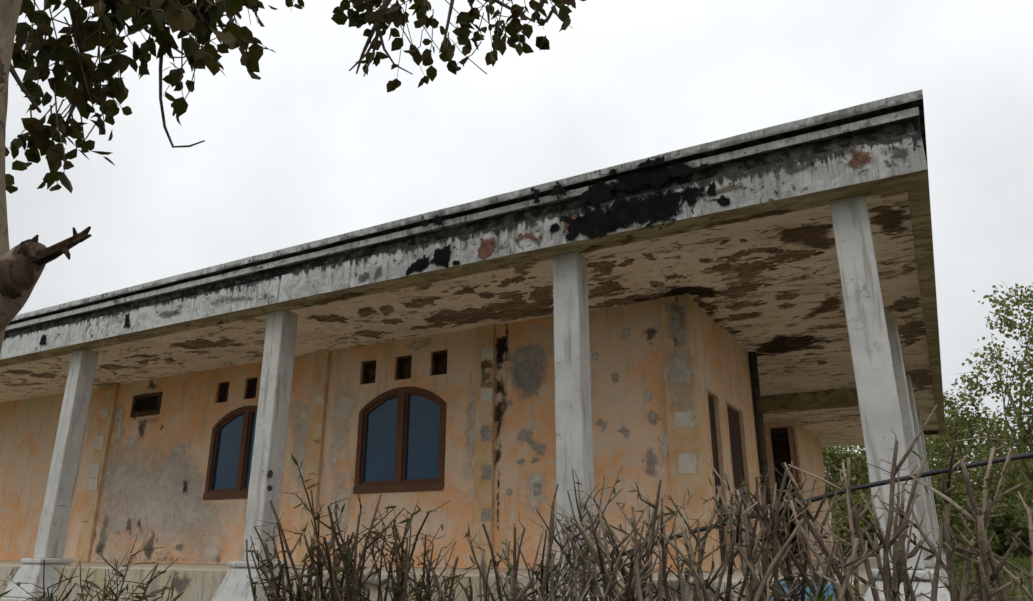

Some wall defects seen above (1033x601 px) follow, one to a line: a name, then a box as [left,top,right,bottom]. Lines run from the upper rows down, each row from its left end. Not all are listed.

leakage [531,154,730,254]
leakage [706,210,793,228]
leakage [777,224,835,256]
peeling [306,275,554,349]
peeling [587,253,687,309]
peeling [698,239,818,321]
peeling [889,296,926,346]
peeling [466,346,549,458]
peeling [642,391,669,476]